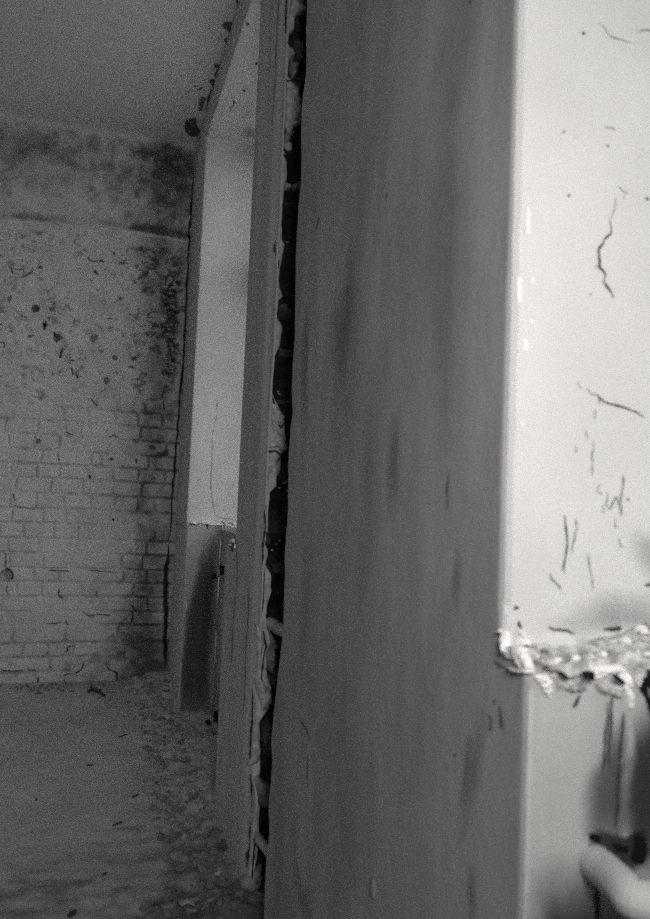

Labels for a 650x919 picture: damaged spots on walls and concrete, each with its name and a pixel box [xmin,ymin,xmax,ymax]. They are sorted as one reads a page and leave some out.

crack [596,186,628,298]
water stain [163,273,178,374]
crack [576,383,645,547]
crack [550,515,593,590]
flaking render [497,628,650,711]
water stain [596,695,650,854]